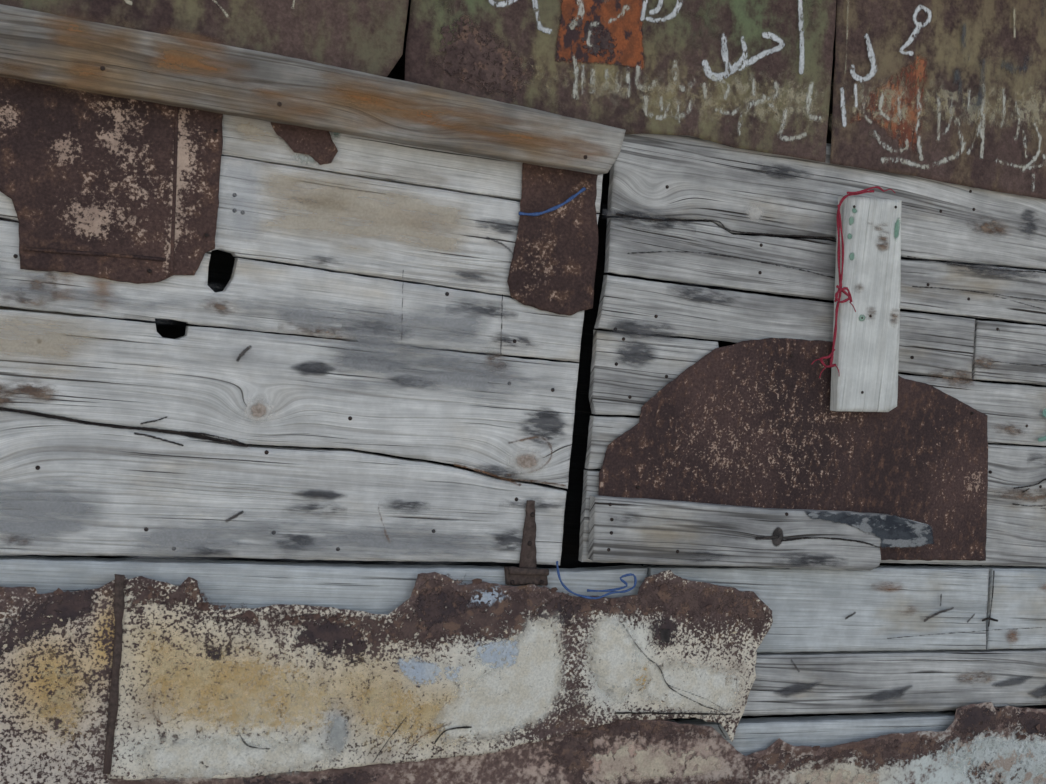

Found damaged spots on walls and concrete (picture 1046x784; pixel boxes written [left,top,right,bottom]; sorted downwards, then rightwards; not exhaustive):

corrosion [435,15,533,100]
corrosion [555,0,645,69]
corrosion [851,55,928,150]
crack [0,407,249,447]
crack [454,437,566,486]
corrosion [0,588,98,655]
corrosion [128,575,769,784]
corrosion [702,703,1046,784]